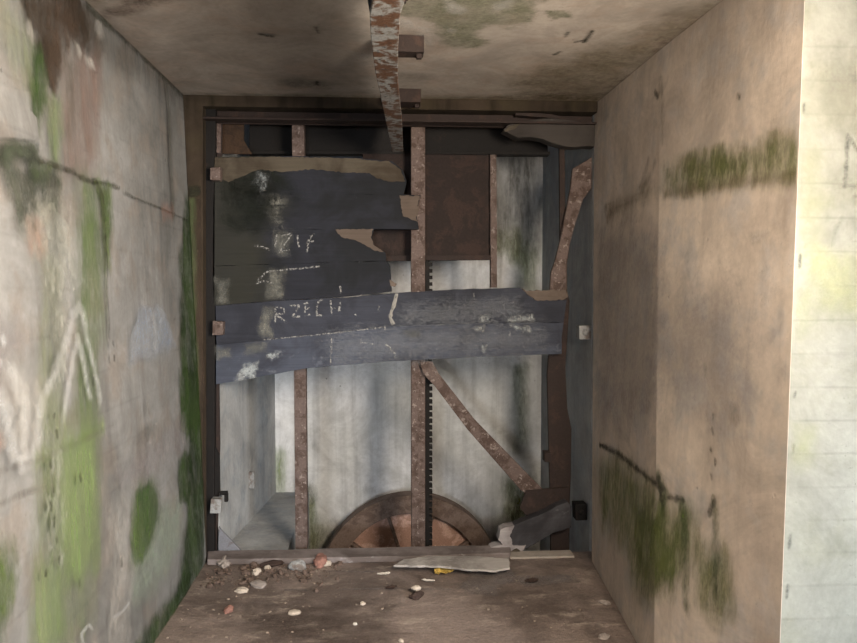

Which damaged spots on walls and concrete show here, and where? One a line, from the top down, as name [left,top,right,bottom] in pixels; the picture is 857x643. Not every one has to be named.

crack [40,160,135,288]
water stain [188,186,205,442]
crack [599,443,684,503]